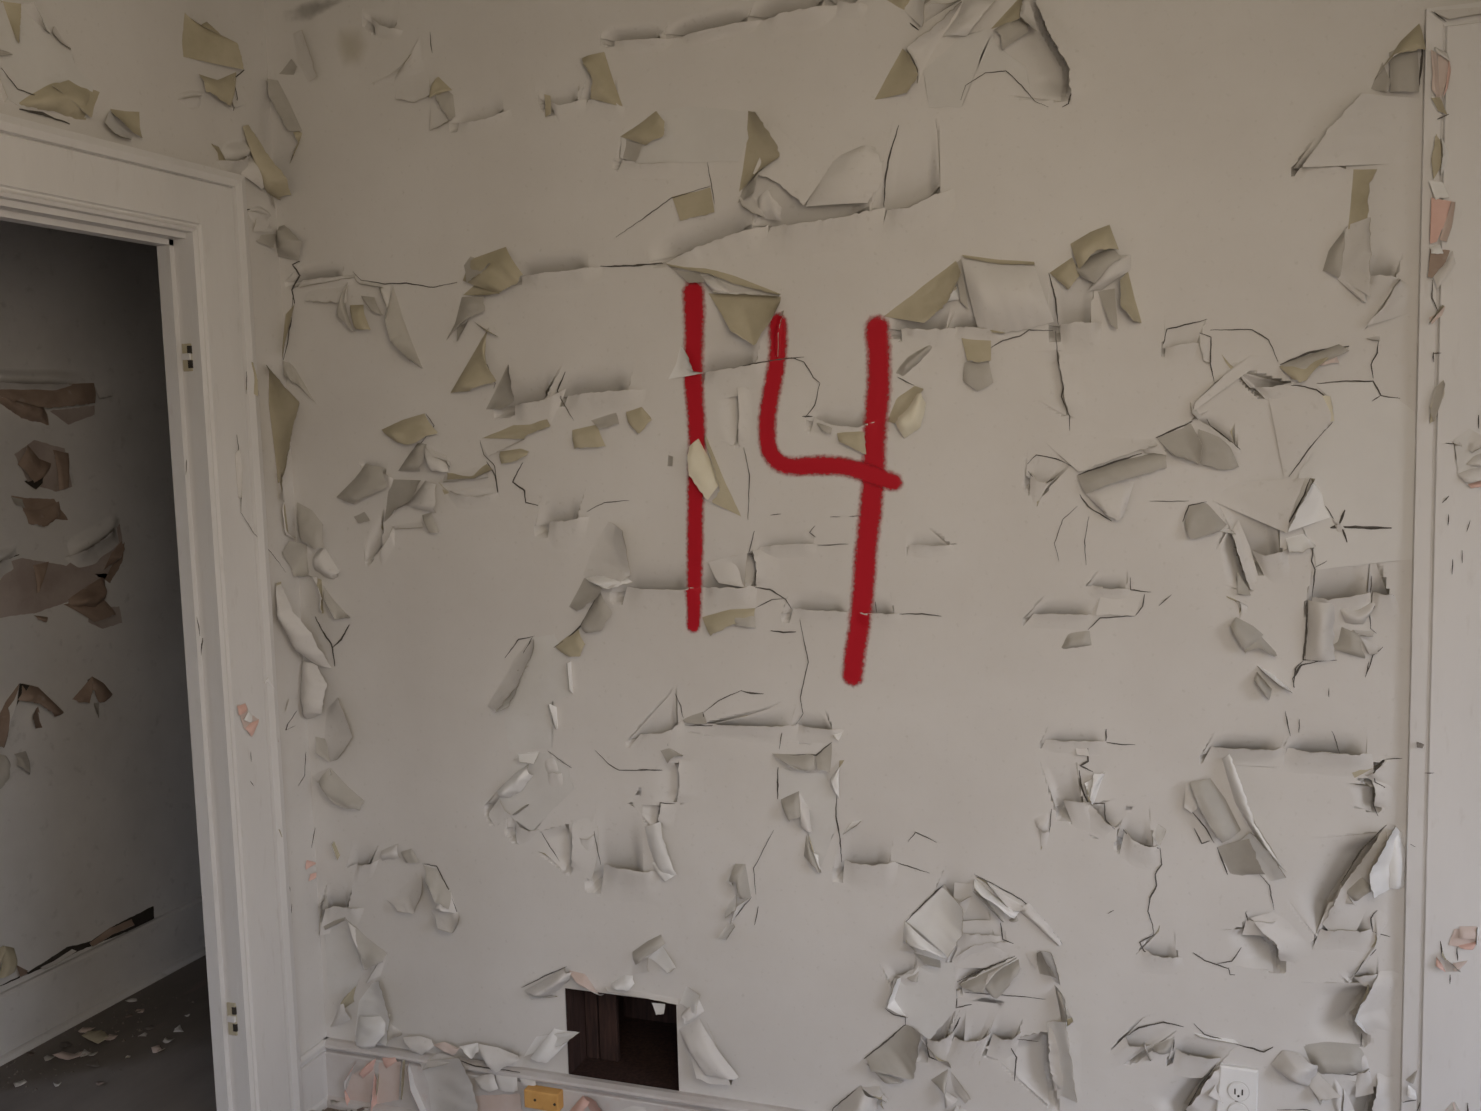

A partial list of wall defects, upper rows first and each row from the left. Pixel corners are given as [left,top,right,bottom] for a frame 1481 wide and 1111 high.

peeling [875,0,1102,111]
peeling [791,259,1053,454]
crack [1018,331,1087,431]
peeling [1042,300,1349,584]
crack [1318,291,1400,401]
peeling [487,521,704,906]
crack [629,681,764,762]
crack [749,514,938,726]
spalling [311,917,738,1111]
crack [753,830,774,925]
crack [1108,849,1162,942]
peeling [1104,751,1420,1111]